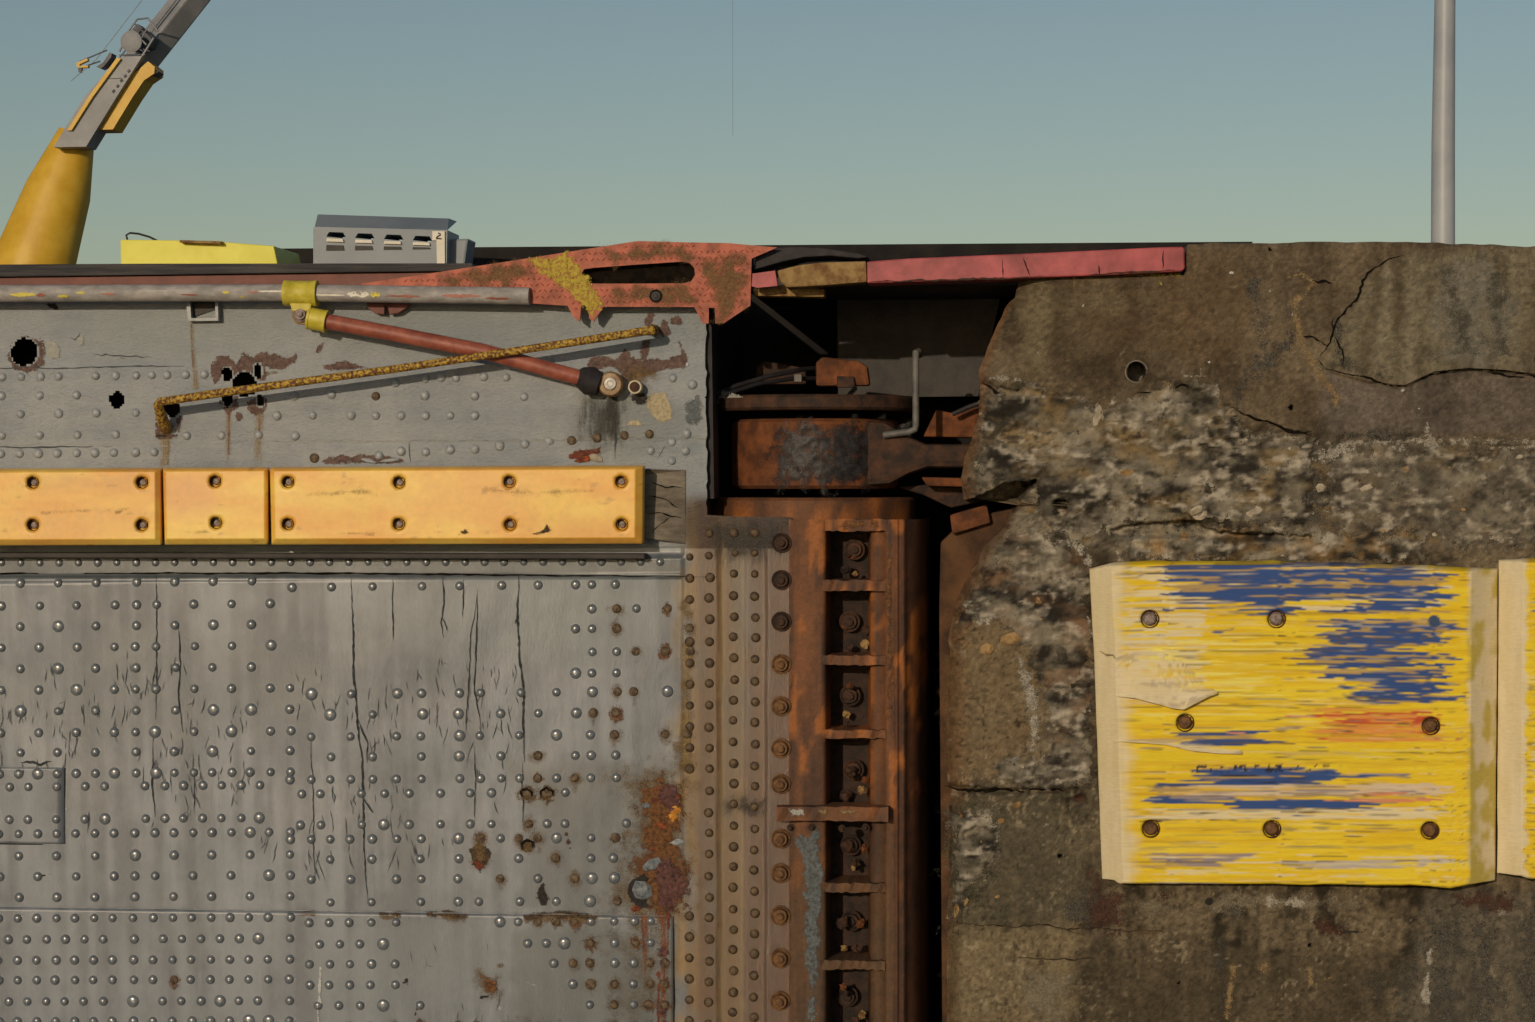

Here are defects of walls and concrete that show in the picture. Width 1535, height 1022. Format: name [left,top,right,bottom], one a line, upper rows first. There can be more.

crack [1303,255,1535,387]
crack [1231,407,1312,435]
spalling [943,377,1535,921]
rust [610,643,693,1022]
rust [426,910,468,921]
rust [477,964,503,999]